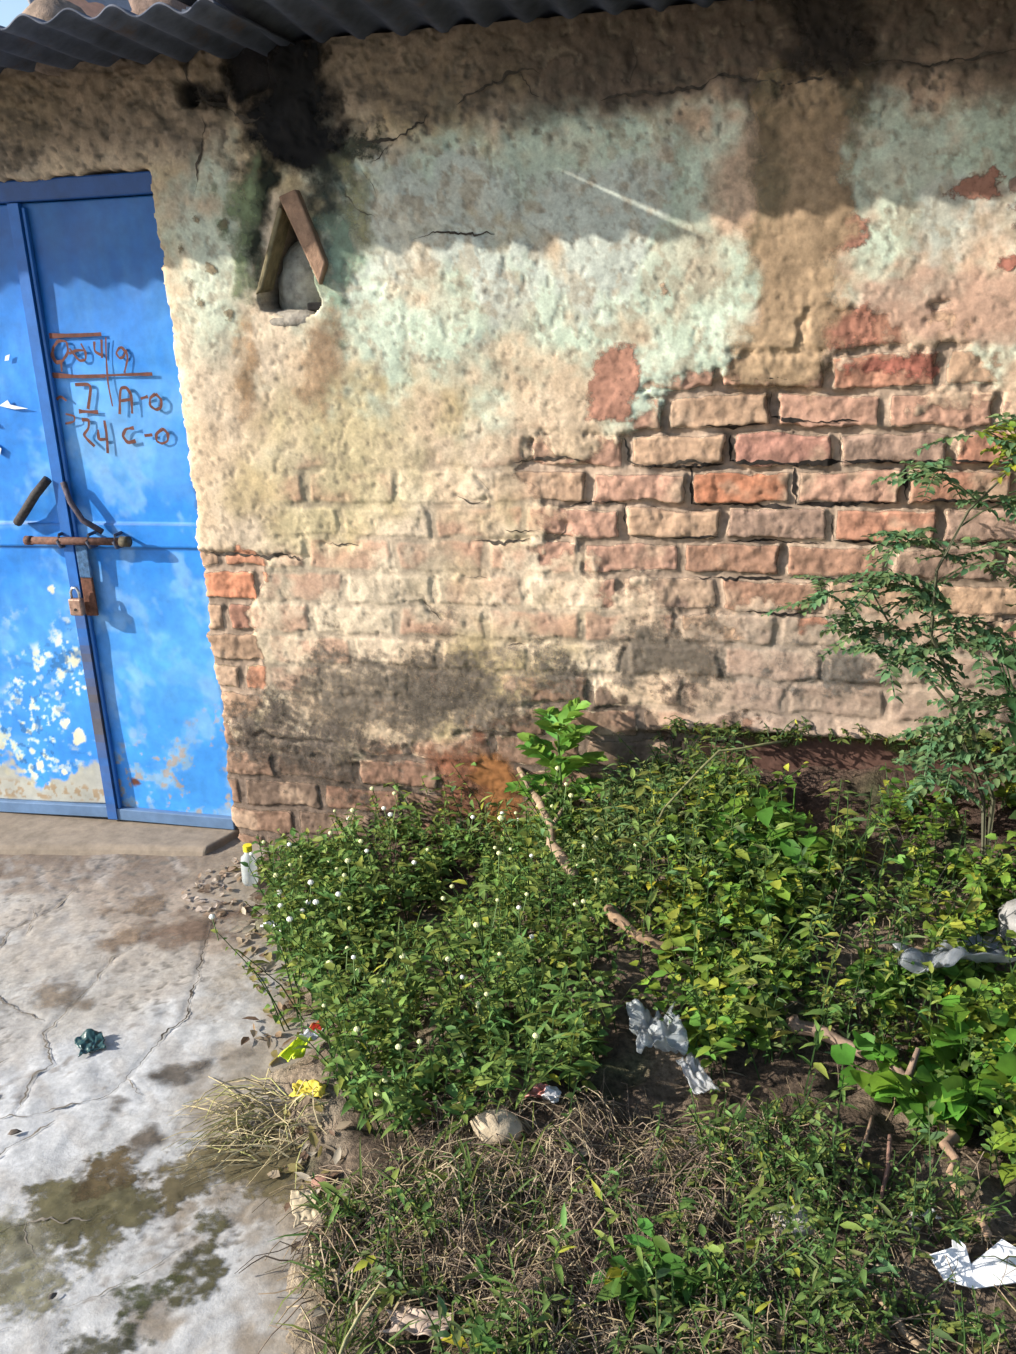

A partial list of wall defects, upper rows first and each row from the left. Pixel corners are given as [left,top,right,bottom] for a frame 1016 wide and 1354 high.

crack [601,41,833,101]
crack [863,49,1016,68]
damp [236,161,281,290]
crack [413,231,492,240]
damp [728,0,878,394]
peeling [943,166,1016,229]
peeling [995,254,1016,271]
flaking render [507,300,1016,650]
damp [225,603,733,814]
crack [0,923,213,1155]
damp [148,1060,210,1084]
damp [130,1124,162,1153]